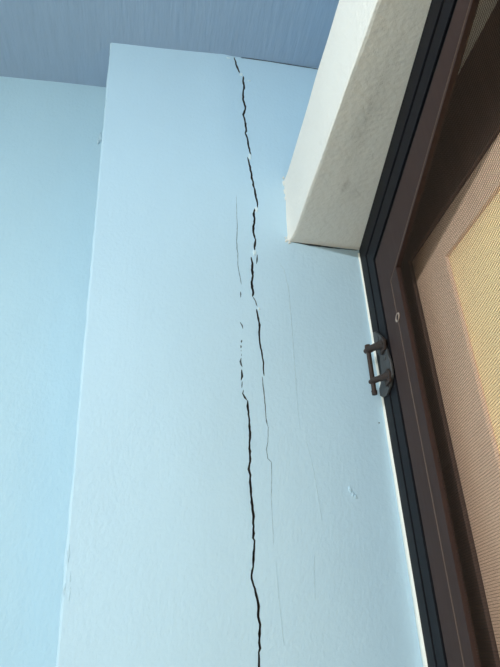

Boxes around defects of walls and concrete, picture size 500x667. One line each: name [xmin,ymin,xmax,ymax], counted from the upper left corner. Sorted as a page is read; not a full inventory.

crack [227,57,317,667]